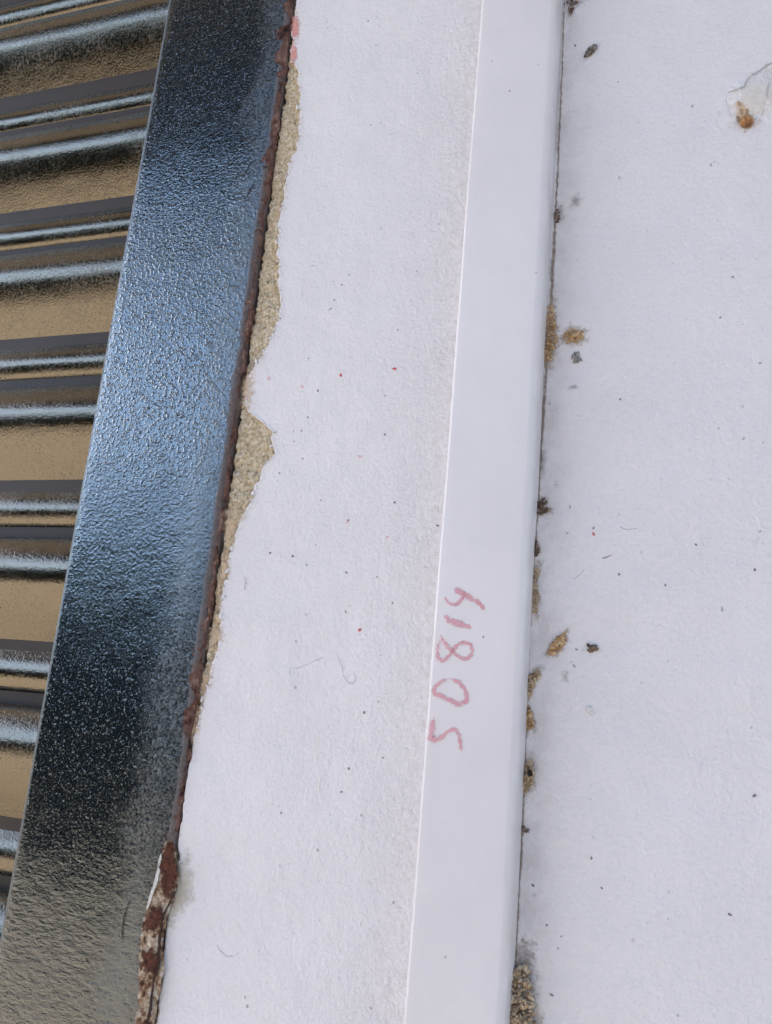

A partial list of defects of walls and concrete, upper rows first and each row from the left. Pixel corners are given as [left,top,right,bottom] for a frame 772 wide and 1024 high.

corrosion [145,0,296,932]
spalling [196,35,303,729]
corrosion [141,948,160,972]